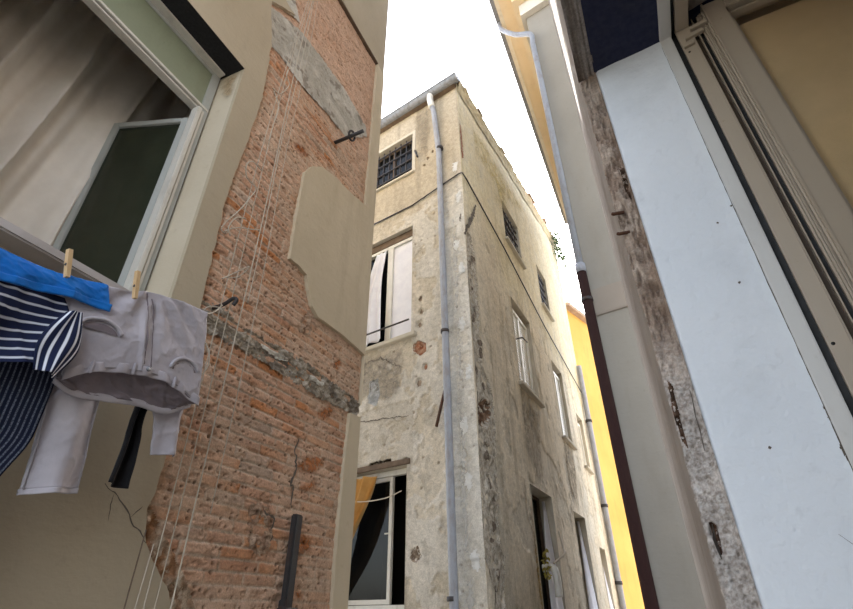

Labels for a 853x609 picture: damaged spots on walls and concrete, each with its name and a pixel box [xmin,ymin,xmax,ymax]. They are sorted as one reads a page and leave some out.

crack [105,483,146,543]
flaking render [145,0,380,609]
spalling [453,233,506,609]
flaking render [580,72,762,609]